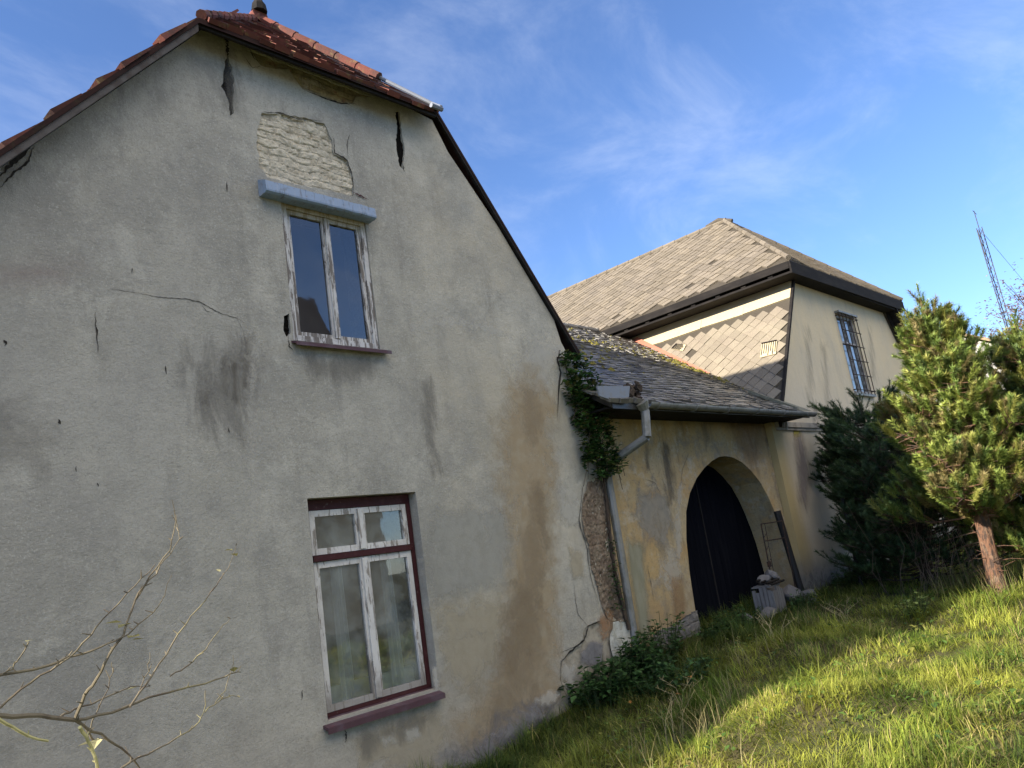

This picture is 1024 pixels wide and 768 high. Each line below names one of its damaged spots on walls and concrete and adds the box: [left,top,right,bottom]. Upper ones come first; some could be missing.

crack [221,39,233,115]
crack [0,147,32,187]
peeling [256,112,369,200]
crack [395,112,404,170]
crack [115,289,246,343]
leakage [457,345,564,744]
spalling [559,478,631,702]